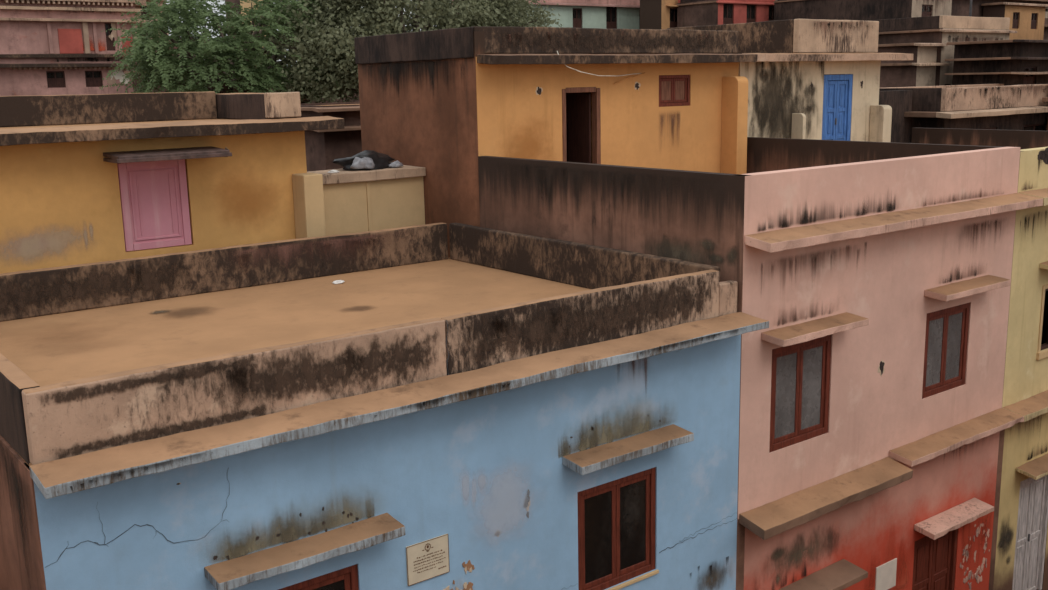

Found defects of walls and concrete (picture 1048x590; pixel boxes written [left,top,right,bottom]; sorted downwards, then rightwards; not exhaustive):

damp [501,31,726,50]
damp [753,52,815,139]
damp [758,215,841,231]
damp [41,335,437,459]
damp [404,383,510,407]
damp [559,415,665,457]
crack [46,467,230,567]
damp [213,504,374,560]
peeling [443,560,475,590]
peeling [960,524,990,590]